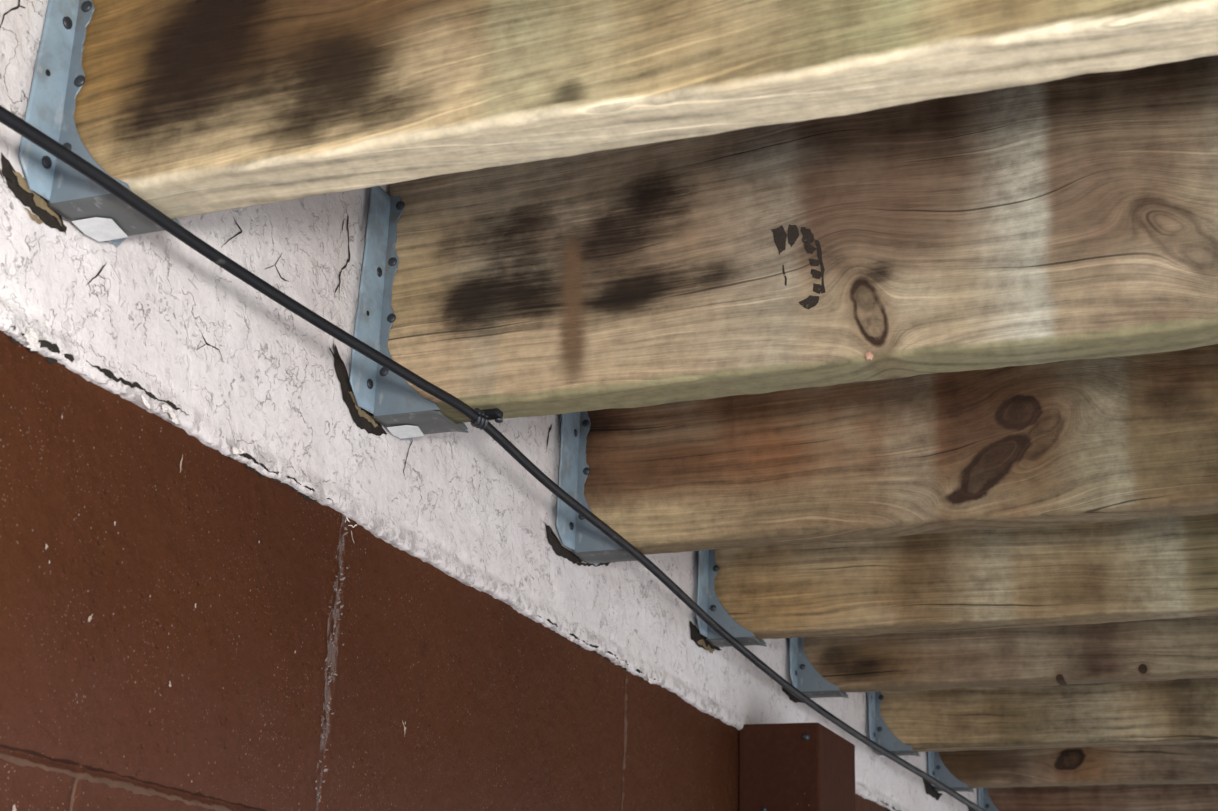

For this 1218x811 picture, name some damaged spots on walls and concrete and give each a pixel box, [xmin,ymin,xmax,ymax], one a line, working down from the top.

crack [0,0,26,28]
damp [121,0,414,143]
spalling [1,153,67,234]
damp [444,179,729,371]
spalling [9,326,189,424]
spalling [333,345,387,436]